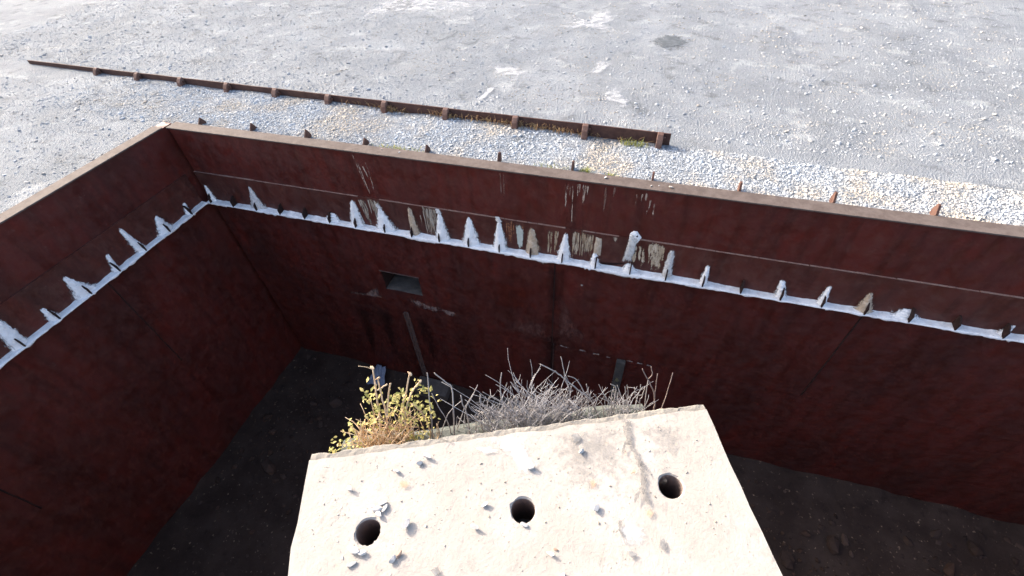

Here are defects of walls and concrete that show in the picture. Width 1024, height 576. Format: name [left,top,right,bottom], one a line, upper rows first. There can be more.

damp [353,156,379,224]
damp [420,206,438,232]
peeling [516,225,524,247]
damp [565,184,594,256]
peeling [632,243,665,269]
crack [616,418,650,537]